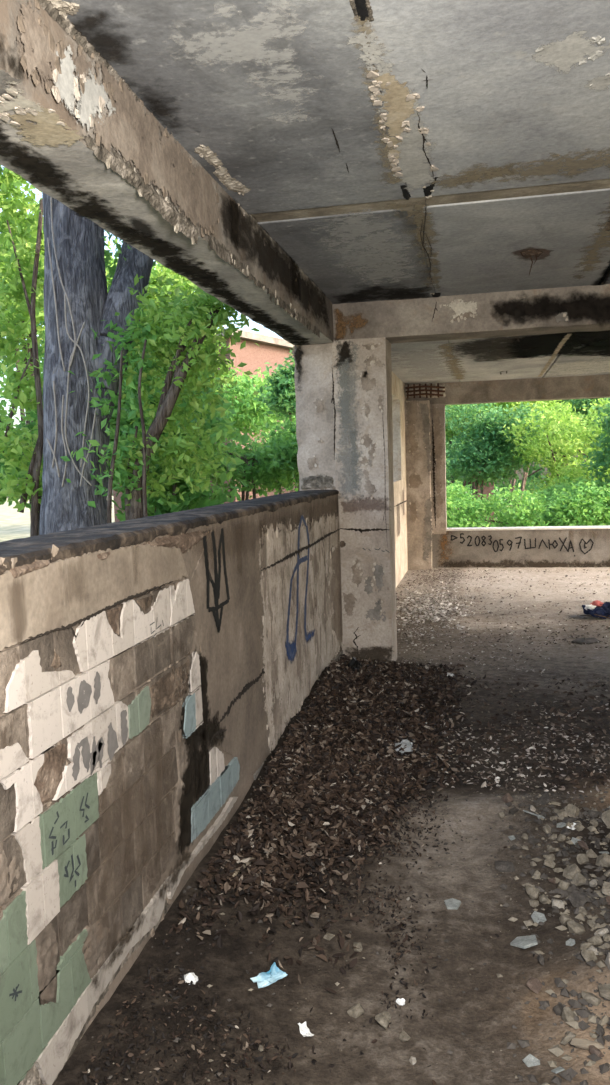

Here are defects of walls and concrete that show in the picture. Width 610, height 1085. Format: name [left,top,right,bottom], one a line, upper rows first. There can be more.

leakage [172,0,315,122]
peeling [347,0,439,200]
peeling [0,0,320,338]
crack [417,113,434,271]
leakage [335,309,368,497]
leakage [553,330,610,376]
crack [261,488,407,571]
crack [430,419,438,528]
flaking render [104,590,155,635]
flaking render [147,652,190,725]
flaking render [34,741,68,807]
leakage [159,658,210,898]